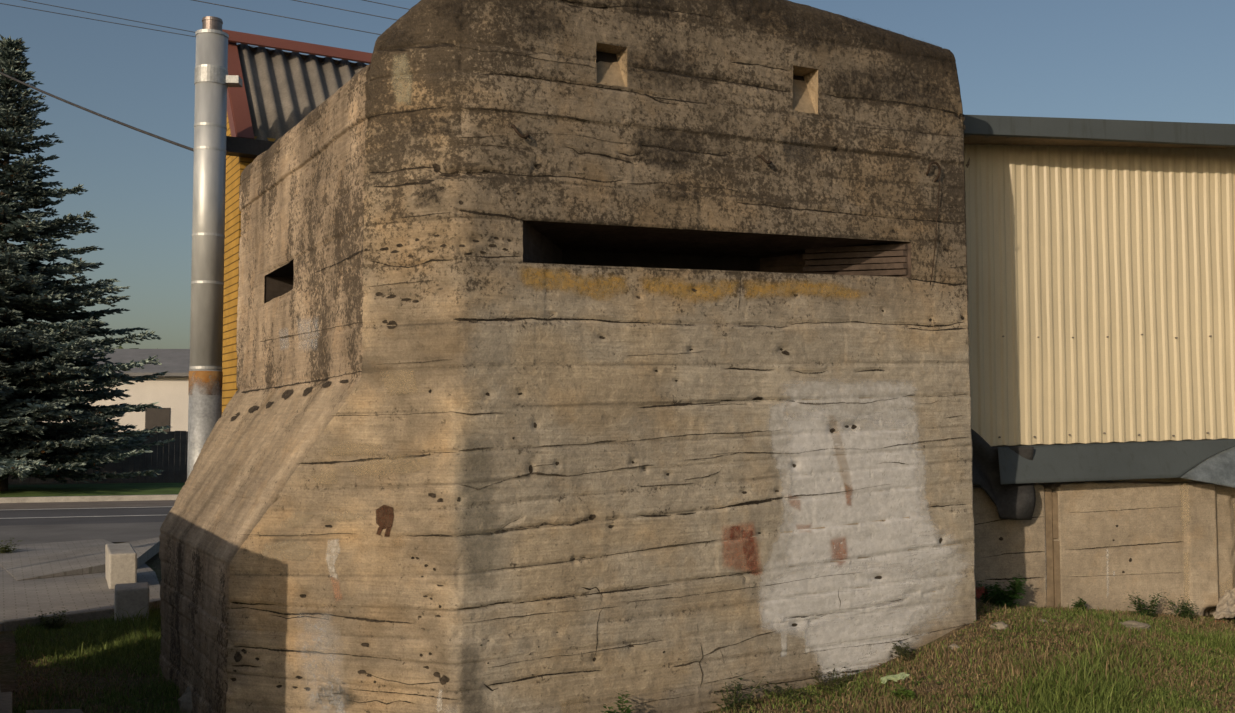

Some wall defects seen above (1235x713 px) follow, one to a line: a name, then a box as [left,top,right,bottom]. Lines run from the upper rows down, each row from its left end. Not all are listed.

crack [260,322,363,342]
crack [454,313,697,356]
corrosion [188,371,223,395]
crack [242,359,452,393]
crack [335,410,495,418]
crack [299,447,492,465]
crack [240,530,352,538]
corrosion [376,505,394,537]
crack [409,368,969,704]
corrosion [723,525,759,574]
crack [228,602,411,624]
crack [233,646,457,705]